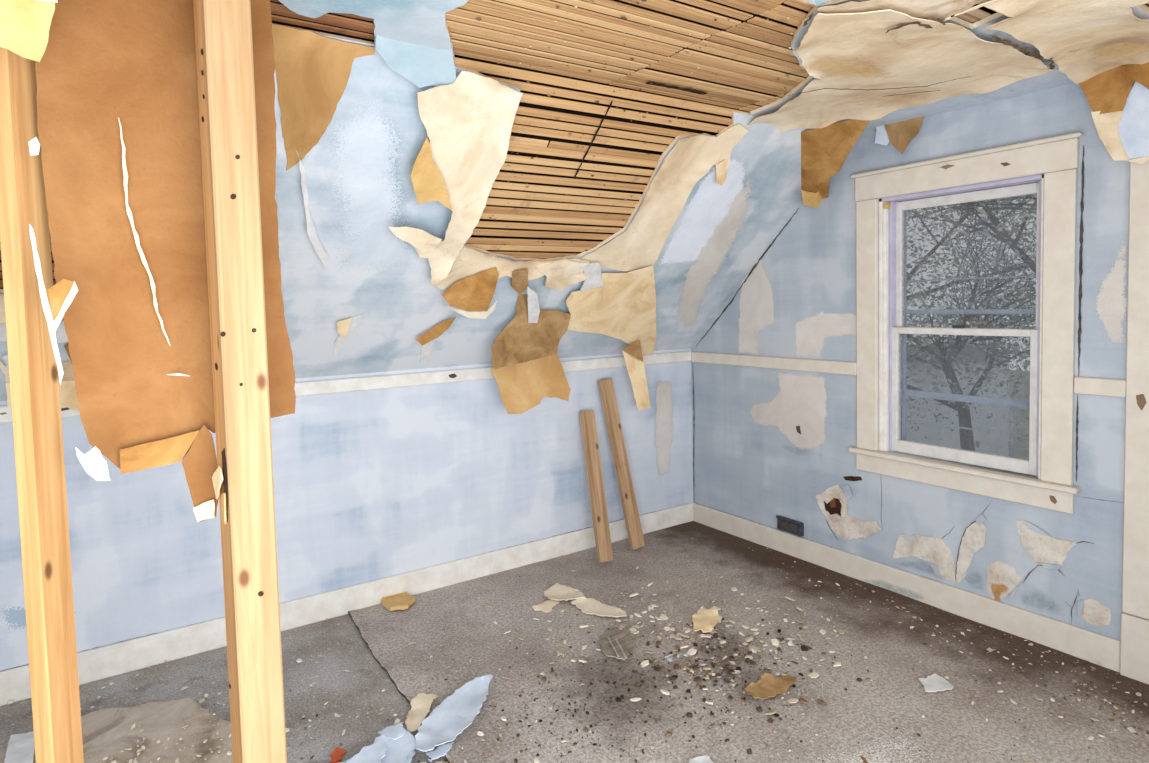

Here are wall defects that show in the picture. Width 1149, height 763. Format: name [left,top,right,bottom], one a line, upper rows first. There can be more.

flaking render [800,0,984,20]
flaking render [272,23,375,270]
peeling [388,71,749,291]
flaking render [0,294,10,383]
peeling [56,318,68,343]
flaking render [59,361,75,382]
peeling [816,476,881,540]
peeling [892,514,987,583]
crack [882,504,1003,603]
peeling [986,560,1022,601]
peeling [1016,520,1078,570]
peeling [1077,599,1111,626]